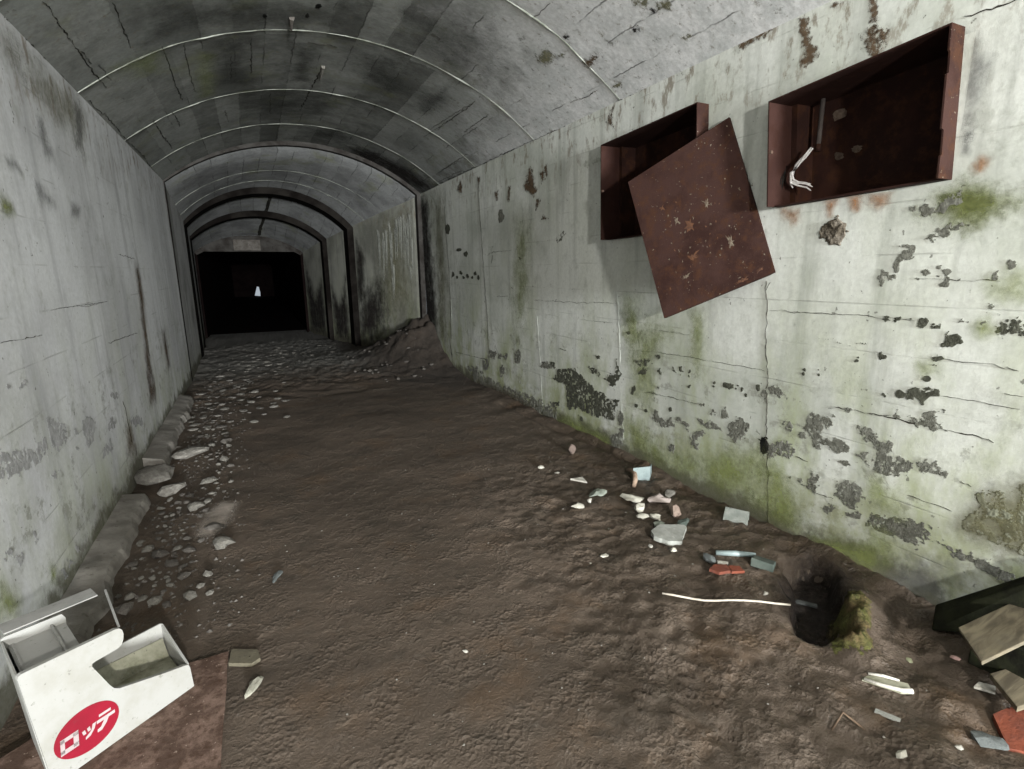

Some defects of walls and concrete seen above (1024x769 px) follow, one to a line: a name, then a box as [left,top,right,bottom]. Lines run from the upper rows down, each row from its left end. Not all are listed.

crack [43,2,155,172]
corrosion [660,201,736,286]
spalling [819,215,849,246]
damp [940,190,1007,227]
peeling [467,349,625,449]
crack [649,281,911,520]
peeling [759,407,949,478]
crack [828,407,994,443]
peeling [823,480,1024,582]